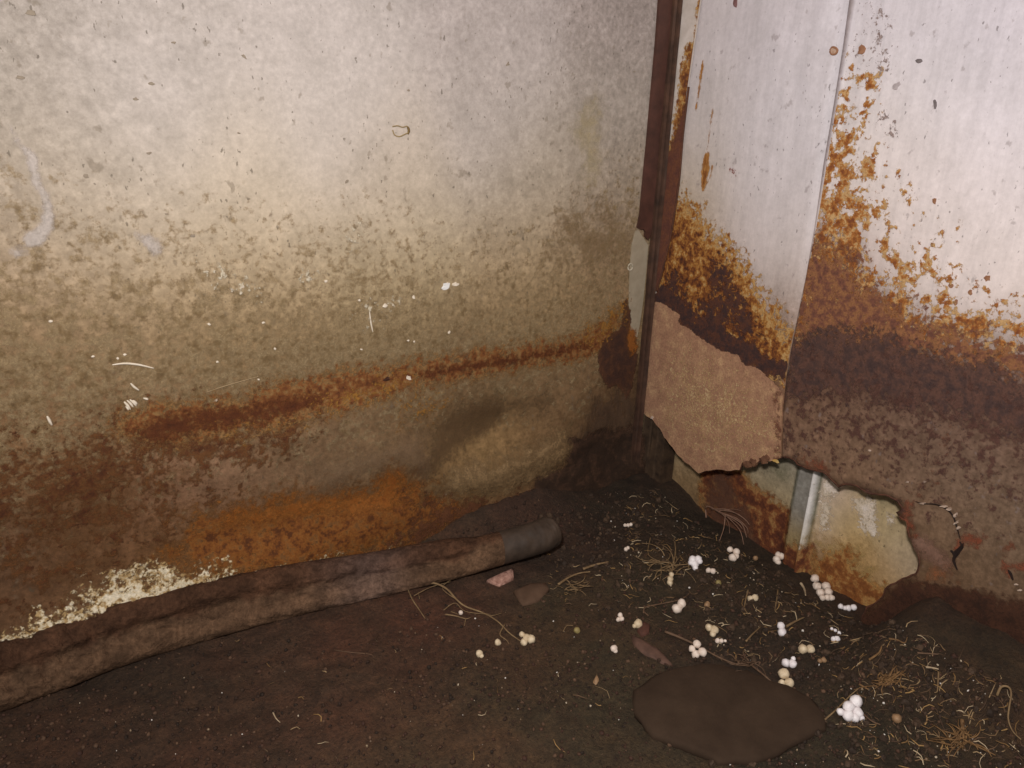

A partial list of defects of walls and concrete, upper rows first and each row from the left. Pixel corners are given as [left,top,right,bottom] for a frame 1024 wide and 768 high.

rust [655,0,1024,538]
efflorescence [0,556,238,641]
rust [0,292,639,619]
rust [698,454,888,606]